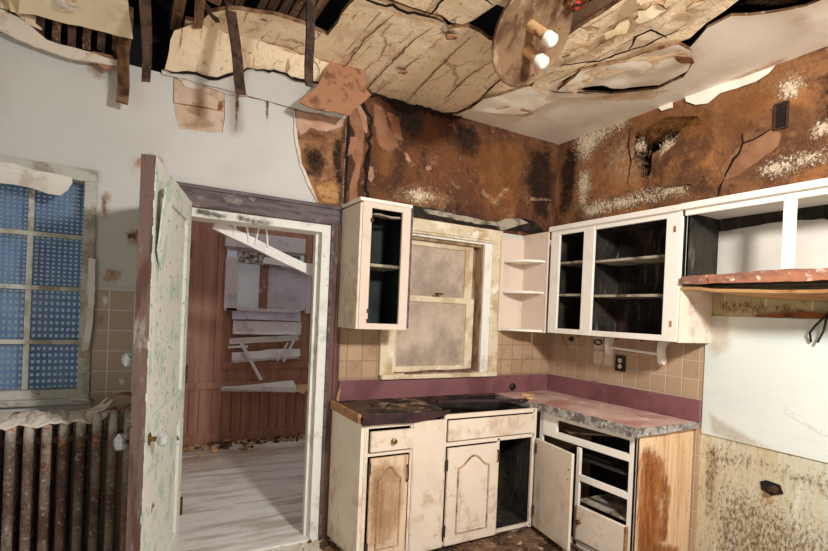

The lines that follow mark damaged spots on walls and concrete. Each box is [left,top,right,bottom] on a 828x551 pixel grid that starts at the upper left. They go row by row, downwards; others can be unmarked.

crack [559,29,679,67]
peeling [562,0,722,58]
flaking render [173,77,225,132]
crack [343,0,492,198]
peeling [469,86,593,115]
peeling [685,64,776,105]
damp [774,74,807,101]
flaking render [293,104,411,206]
damp [457,116,688,219]
crack [717,129,771,197]
damp [756,105,828,180]
damp [706,447,828,551]